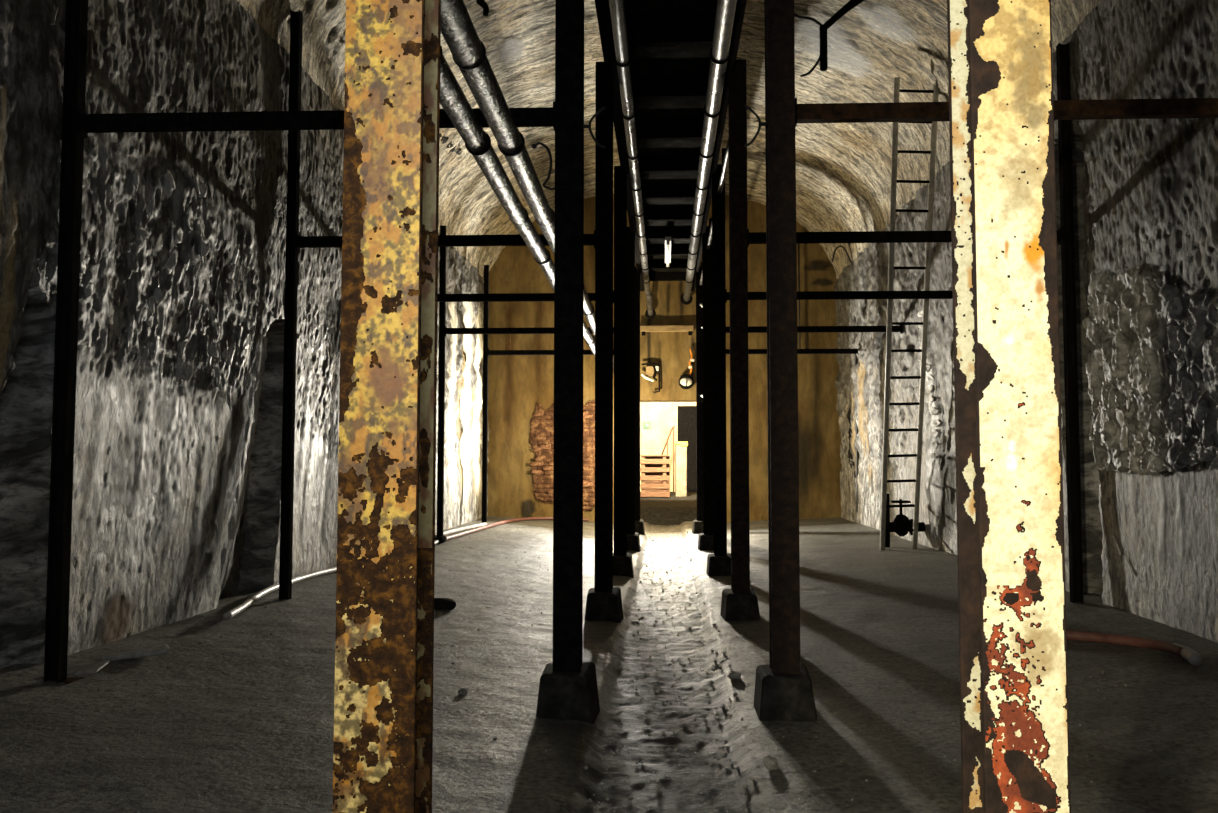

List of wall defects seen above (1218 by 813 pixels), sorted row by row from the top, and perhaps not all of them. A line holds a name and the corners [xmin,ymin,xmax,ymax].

flaking render [529,404,554,504]
flaking render [583,400,595,512]
peeling [950,0,1069,813]